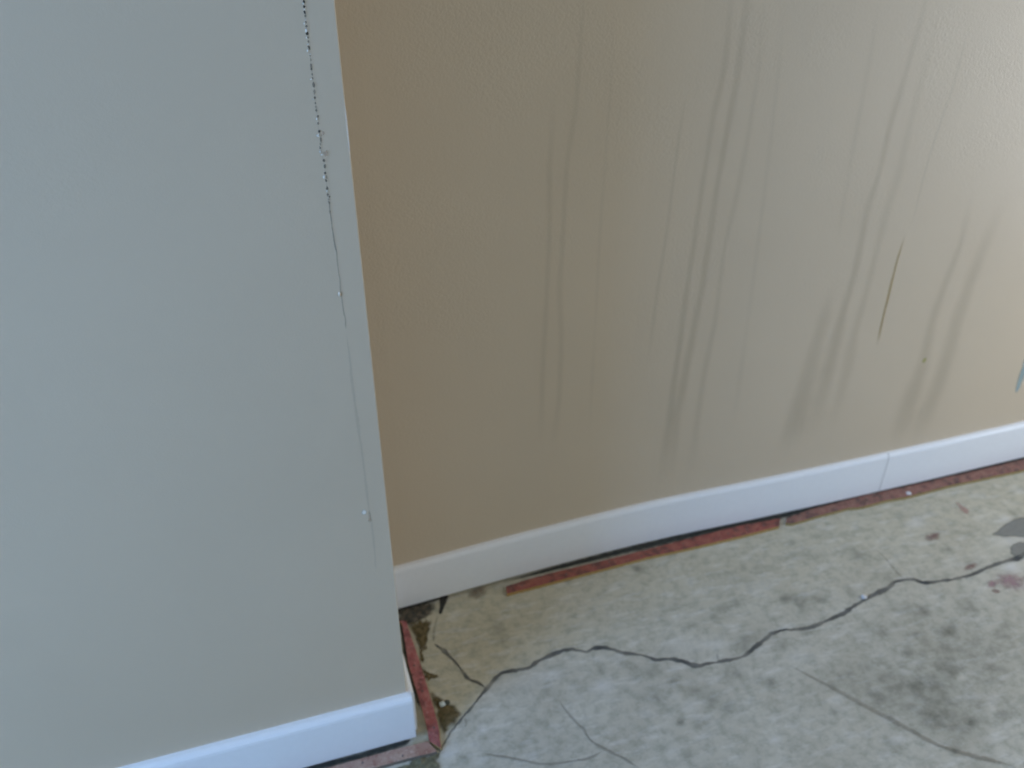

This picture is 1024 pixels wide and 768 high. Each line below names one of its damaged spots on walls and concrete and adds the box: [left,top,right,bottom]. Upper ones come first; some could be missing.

crack [302,0,330,198]
spalling [411,620,438,681]
spalling [432,694,460,732]
crack [435,553,1024,753]